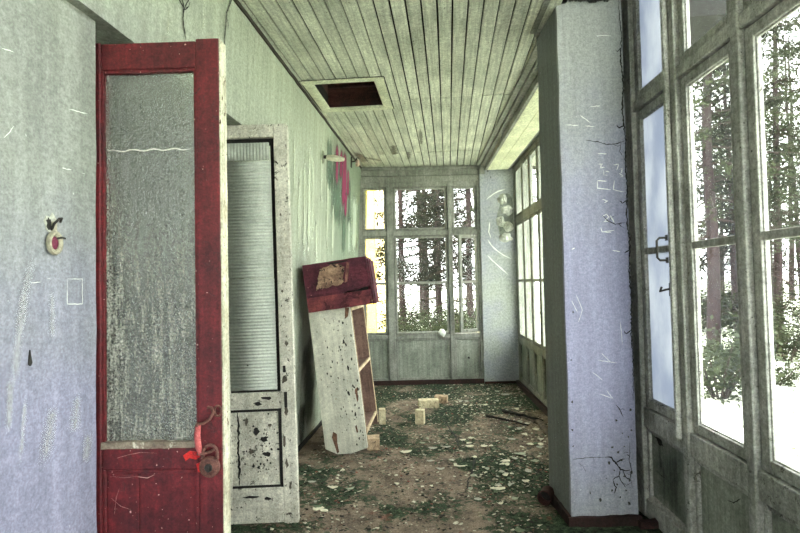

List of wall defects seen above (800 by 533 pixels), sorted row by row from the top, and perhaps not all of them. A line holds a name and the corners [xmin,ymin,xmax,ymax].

crack [586,0,634,393]
crack [574,442,632,493]